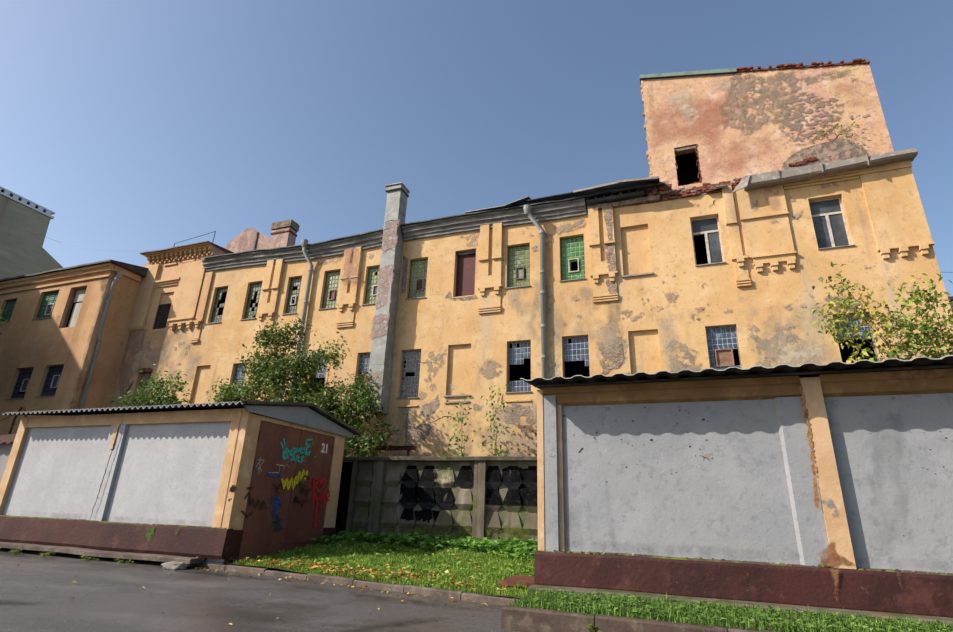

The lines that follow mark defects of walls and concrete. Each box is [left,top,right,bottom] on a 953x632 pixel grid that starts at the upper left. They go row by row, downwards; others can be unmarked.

flaking render [368,220,399,259]
flaking render [370,264,394,341]
spalling [399,350,446,446]
peeling [479,360,501,379]
spalling [597,272,684,375]
peeling [667,341,701,372]
peeling [749,294,816,367]
peeling [798,383,820,508]
rust [821,542,854,591]